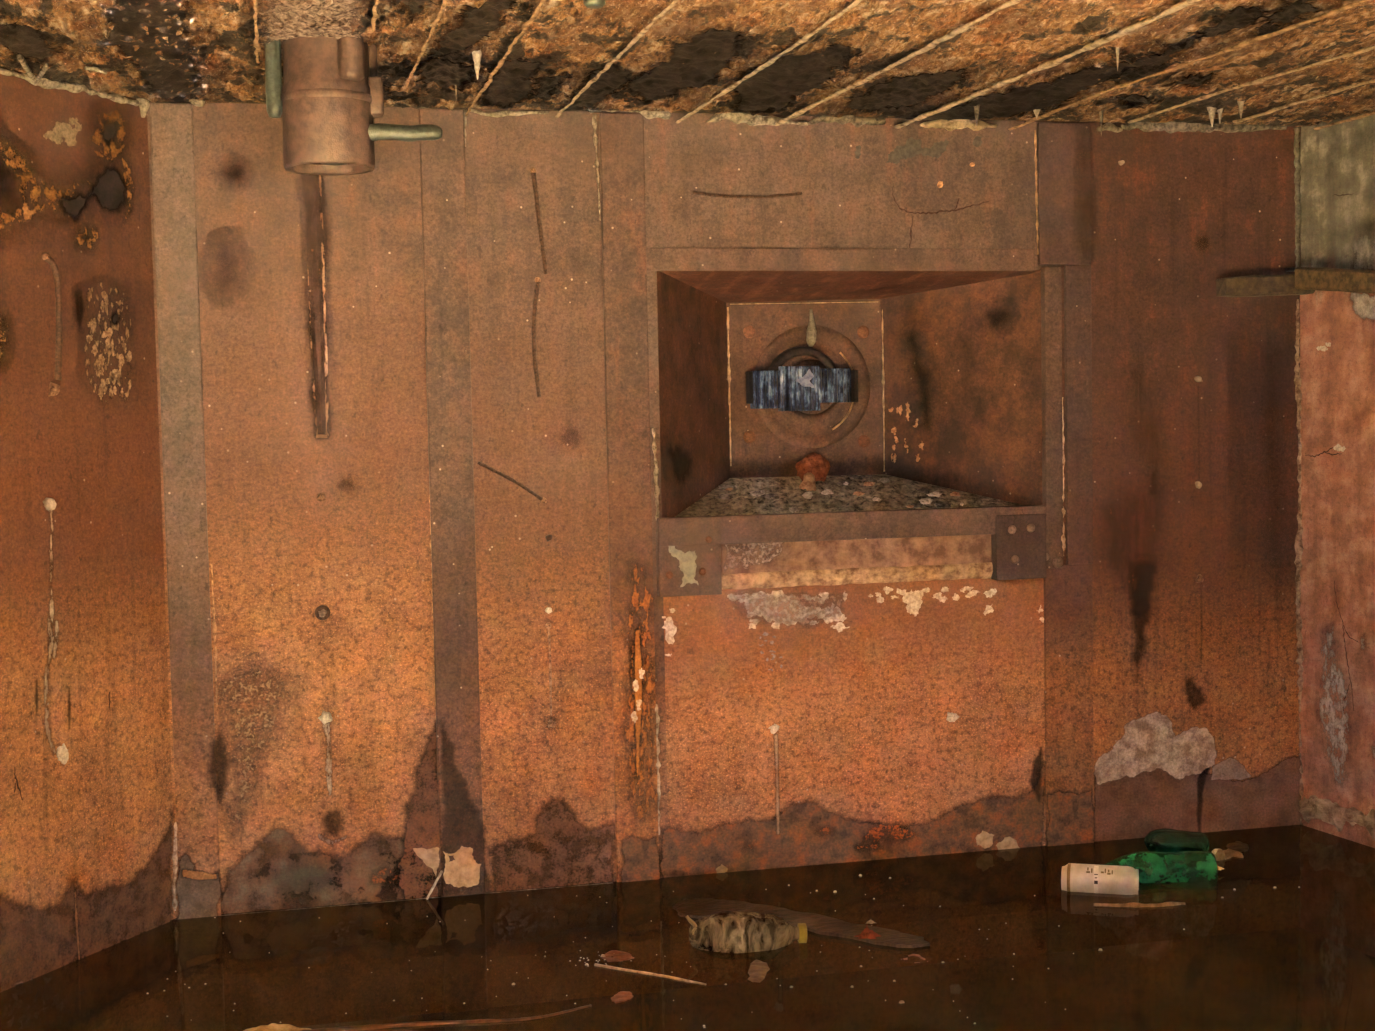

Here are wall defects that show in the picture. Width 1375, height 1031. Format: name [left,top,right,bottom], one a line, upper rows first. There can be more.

damp [0,0,205,118]
damp [264,0,361,41]
damp [393,0,435,22]
damp [411,0,1319,133]
damp [60,166,128,249]
damp [75,290,83,325]
peeling [727,590,849,671]
peeling [869,586,997,617]
corrosion [1104,490,1159,678]
corrosion [623,563,659,821]
peeling [1094,712,1251,785]
damp [0,724,1301,993]